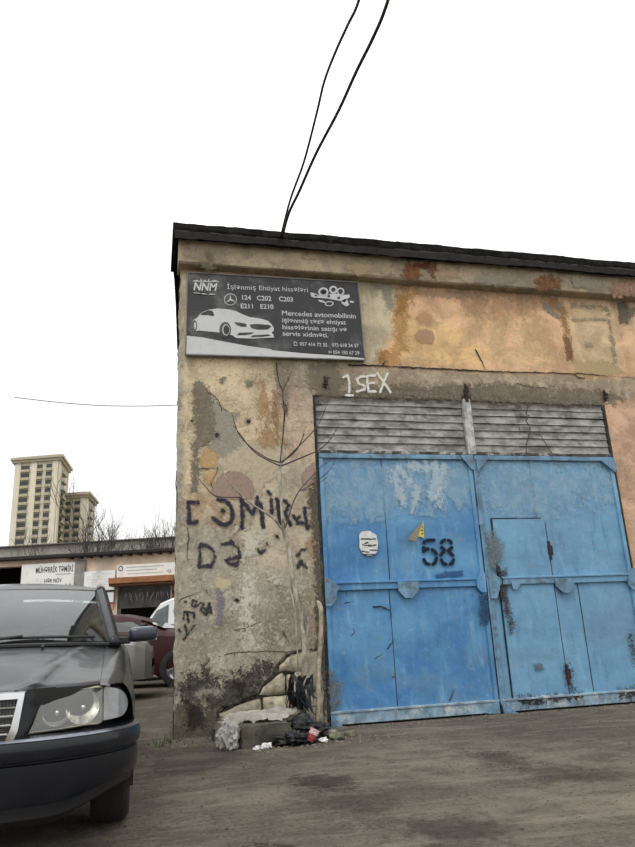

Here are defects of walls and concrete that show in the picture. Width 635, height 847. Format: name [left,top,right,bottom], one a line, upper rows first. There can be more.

corrosion [378,260,438,368]
flaking render [417,272,517,299]
corrosion [533,274,573,360]
flaking render [542,300,630,379]
flaking render [571,276,635,298]
flaking render [186,380,286,494]
corrosion [478,527,516,635]
leakage [167,655,280,738]